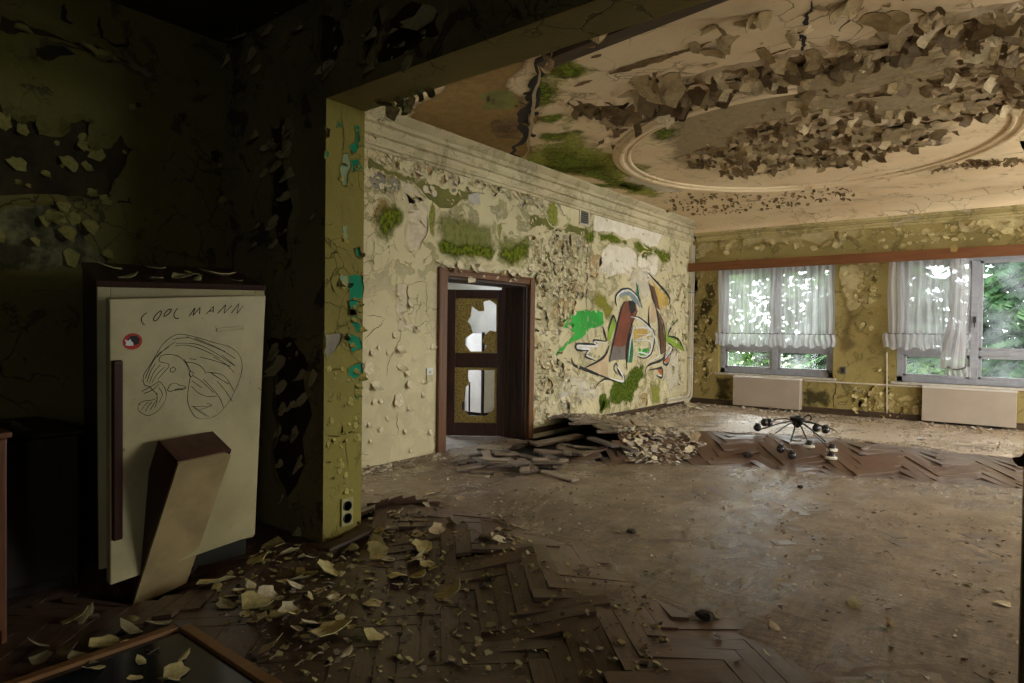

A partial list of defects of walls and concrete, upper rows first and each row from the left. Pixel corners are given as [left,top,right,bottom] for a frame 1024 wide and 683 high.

crack [668,41,712,55]
crack [772,1,814,56]
peeling [373,87,436,121]
peeling [554,0,1024,180]
peeling [0,95,140,278]
peeling [324,119,1024,427]
peeling [263,273,428,510]
water stain [702,359,730,399]
mould [803,389,829,407]
peeling [1012,454,1024,467]